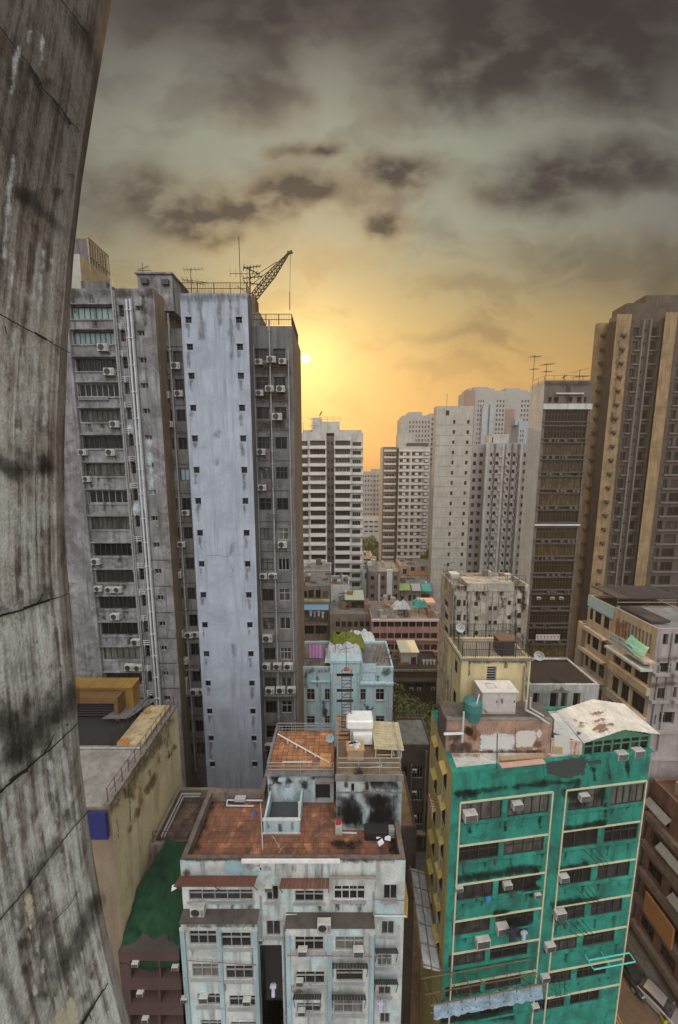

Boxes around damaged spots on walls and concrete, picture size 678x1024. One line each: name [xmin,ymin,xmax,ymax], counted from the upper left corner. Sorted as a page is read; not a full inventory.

crack [0,27,80,132]
water stain [0,456,53,478]
crack [0,593,70,617]
water stain [0,687,79,762]
crack [0,722,80,793]
flaking render [479,729,601,778]
water stain [336,768,398,828]
water stain [569,774,613,826]
crack [0,810,90,920]
water stain [524,870,541,900]